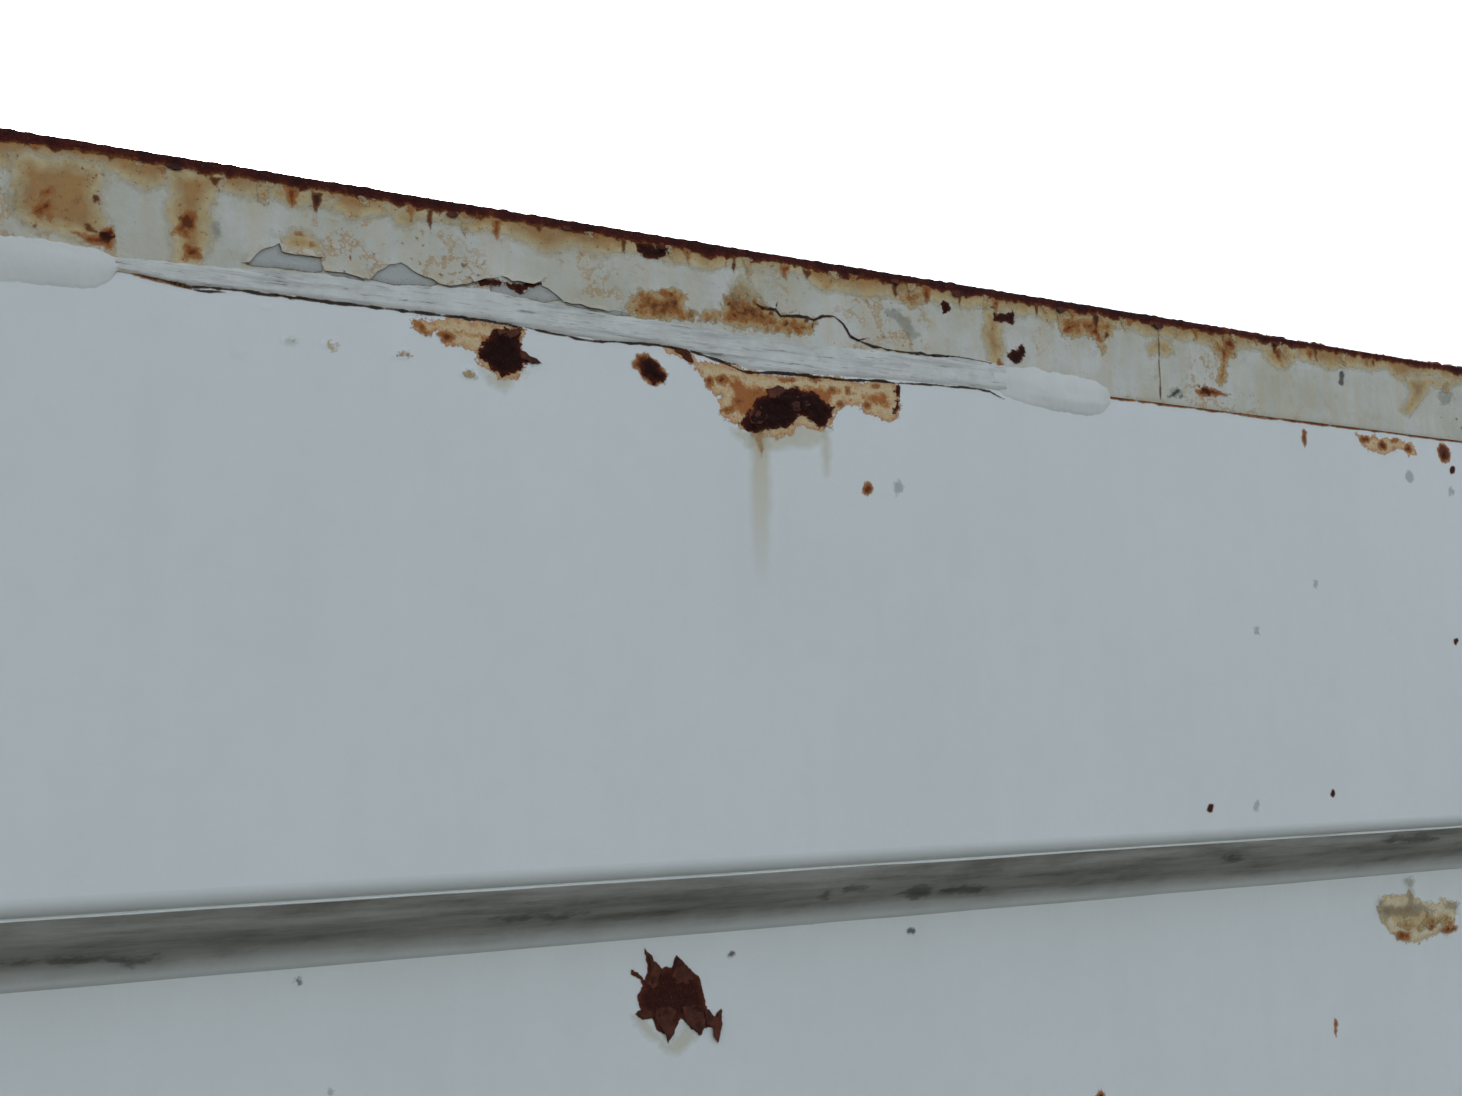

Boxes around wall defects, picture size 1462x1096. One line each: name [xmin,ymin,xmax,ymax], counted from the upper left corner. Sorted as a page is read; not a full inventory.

peeling [243,238,631,316]
crack [143,276,1002,398]
rust [0,128,1462,474]